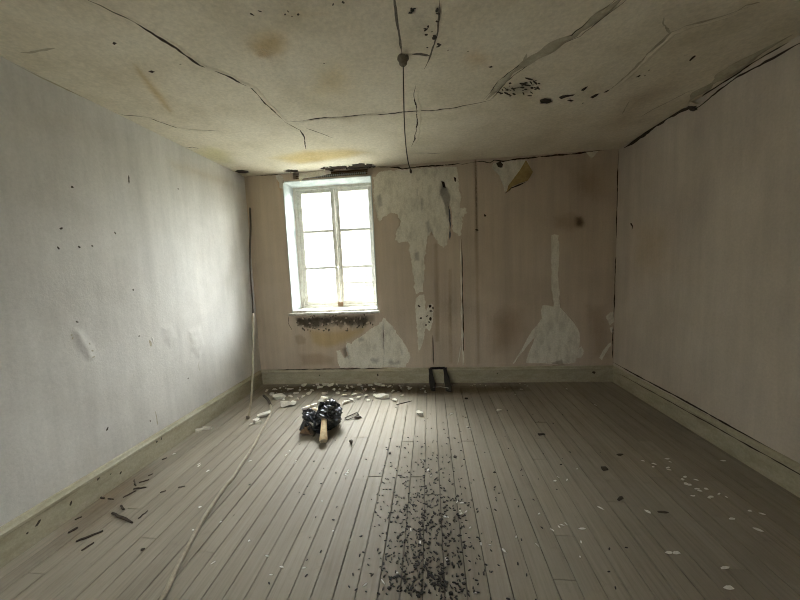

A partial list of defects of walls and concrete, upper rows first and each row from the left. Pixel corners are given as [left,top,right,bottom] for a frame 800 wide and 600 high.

crack [121,113,225,158]
crack [88,0,491,148]
water stain [498,77,540,97]
spalling [539,85,611,104]
crack [608,2,760,92]
water stain [296,314,373,332]
peeling [276,163,467,376]
peeling [512,234,584,365]